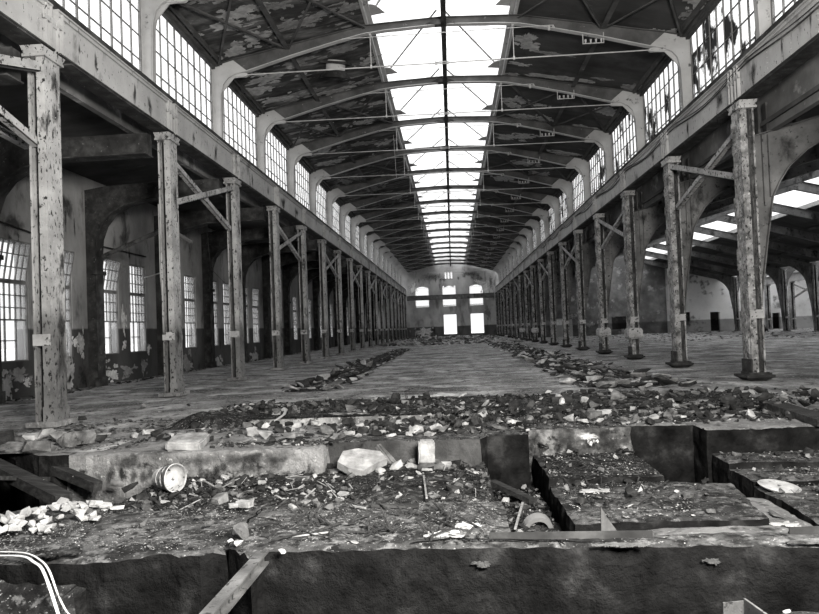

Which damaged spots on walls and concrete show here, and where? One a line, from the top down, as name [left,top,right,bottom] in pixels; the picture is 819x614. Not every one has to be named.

peeling [187,0,371,60]
peeling [514,33,576,58]
peeling [652,0,708,33]
peeling [241,38,383,105]
peeling [505,61,642,91]
peeling [500,95,554,122]
peeling [494,133,540,142]
peeling [106,344,151,382]
peeling [2,367,33,400]